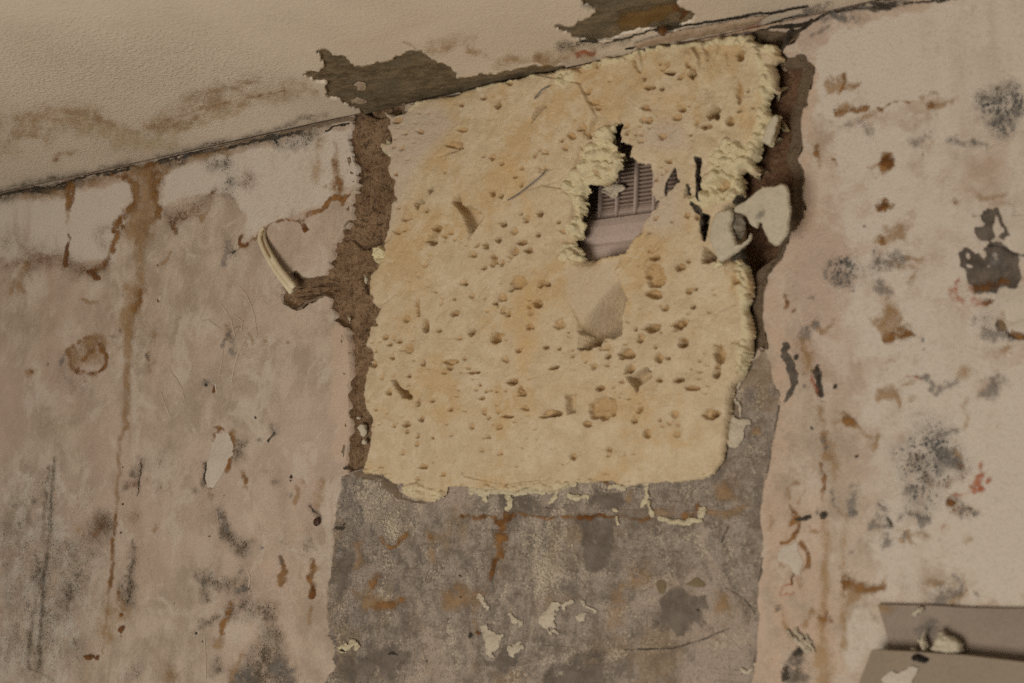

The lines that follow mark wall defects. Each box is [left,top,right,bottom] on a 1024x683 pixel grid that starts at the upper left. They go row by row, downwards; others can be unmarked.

peeling [556,0,695,40]
damp [47,336,108,385]
damp [119,223,146,439]
flaking render [279,28,816,683]
spalling [205,426,245,488]
damp [868,413,990,547]
damp [0,451,166,681]
rust [443,512,619,609]